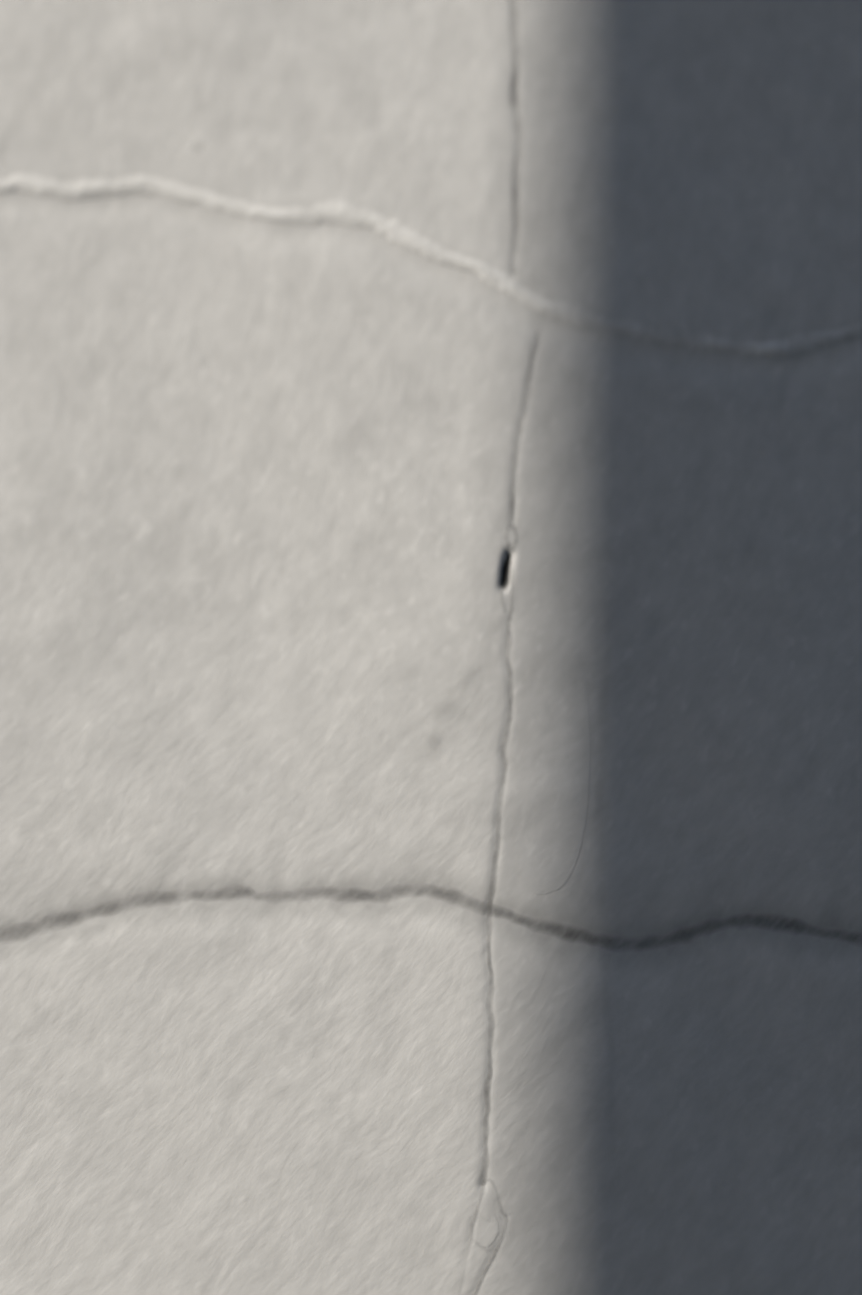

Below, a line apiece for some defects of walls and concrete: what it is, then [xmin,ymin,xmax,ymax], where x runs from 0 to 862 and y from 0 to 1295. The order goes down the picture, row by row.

crack [477,1211,499,1271]